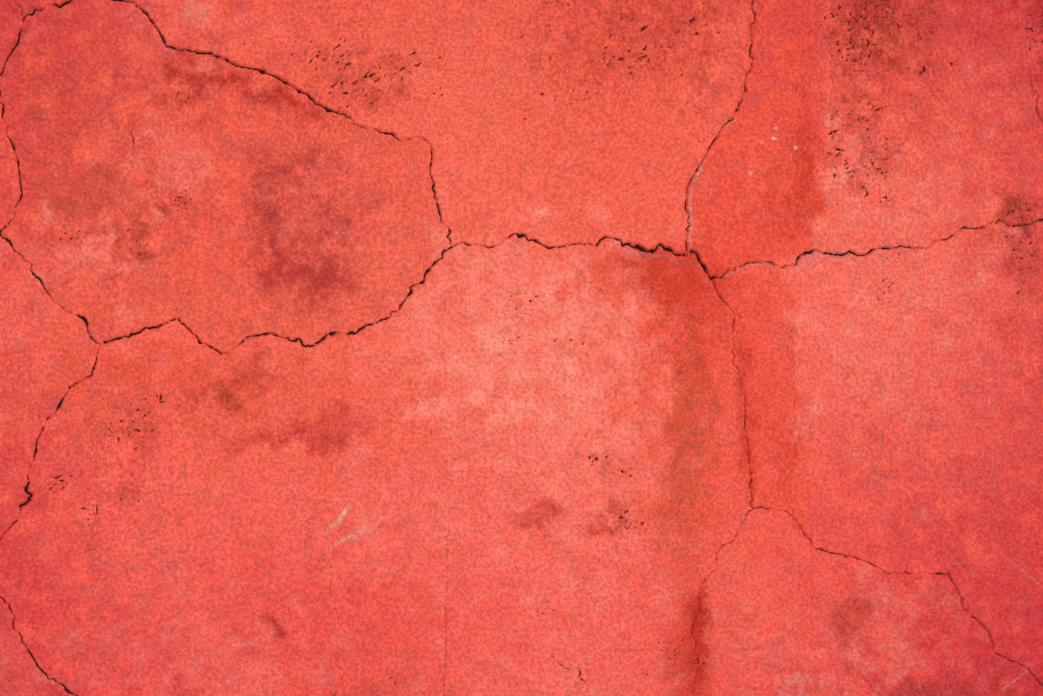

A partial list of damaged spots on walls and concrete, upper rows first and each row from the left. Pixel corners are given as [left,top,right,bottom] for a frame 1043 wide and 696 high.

crack [0,0,226,539]
crack [112,0,1043,348]
crack [0,597,78,696]
crack [691,349,914,636]
crack [932,560,1043,687]